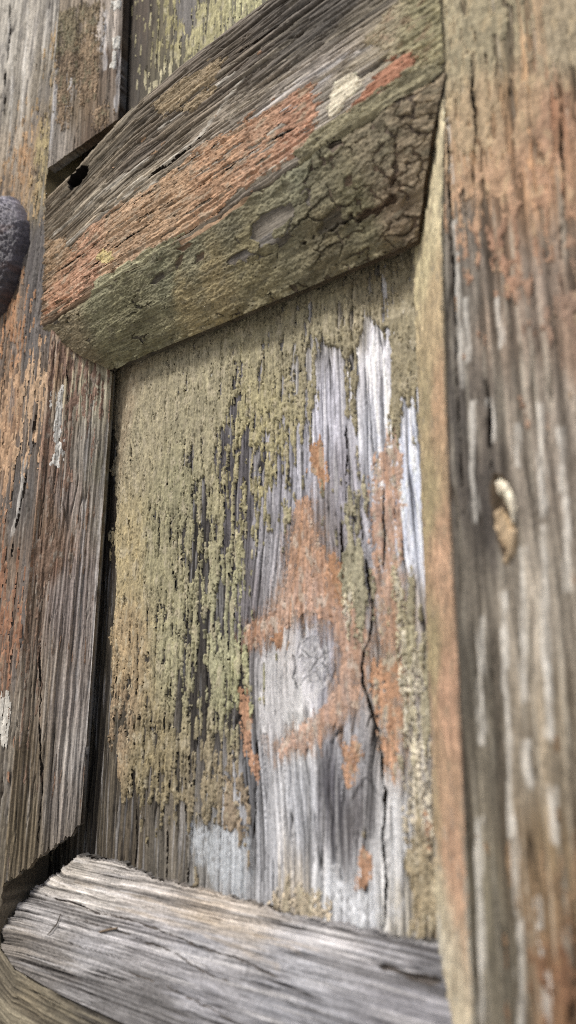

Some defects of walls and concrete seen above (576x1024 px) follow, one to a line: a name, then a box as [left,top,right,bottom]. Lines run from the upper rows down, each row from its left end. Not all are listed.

peeling [0,266,65,748]
peeling [0,0,122,228]
peeling [42,73,474,1024]
peeling [40,0,576,316]
crack [339,426,389,929]
peeling [522,274,576,359]